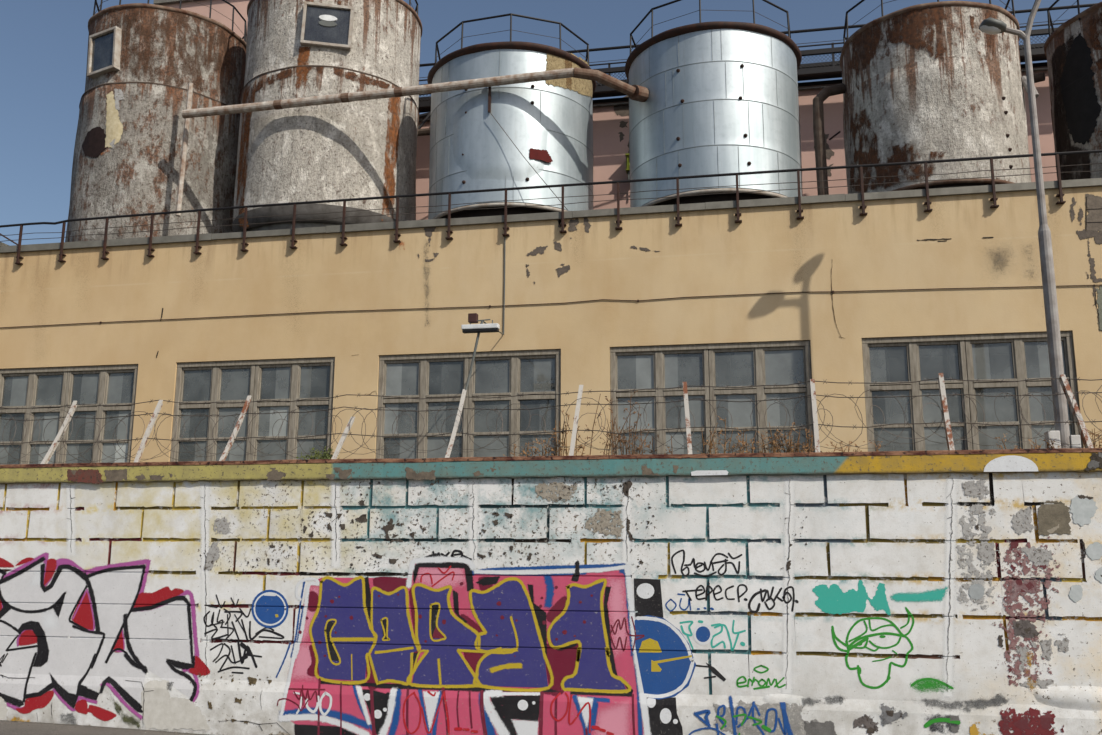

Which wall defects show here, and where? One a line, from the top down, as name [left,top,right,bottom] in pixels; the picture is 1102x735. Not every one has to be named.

rust [98,8,234,91]
rust [846,6,948,90]
rust [970,10,1004,65]
peeling [105,89,124,149]
rust [236,46,401,229]
rust [849,108,948,193]
rust [1051,34,1091,180]
peeling [526,218,591,284]
spalling [1070,194,1102,297]
spalling [998,495,1098,689]